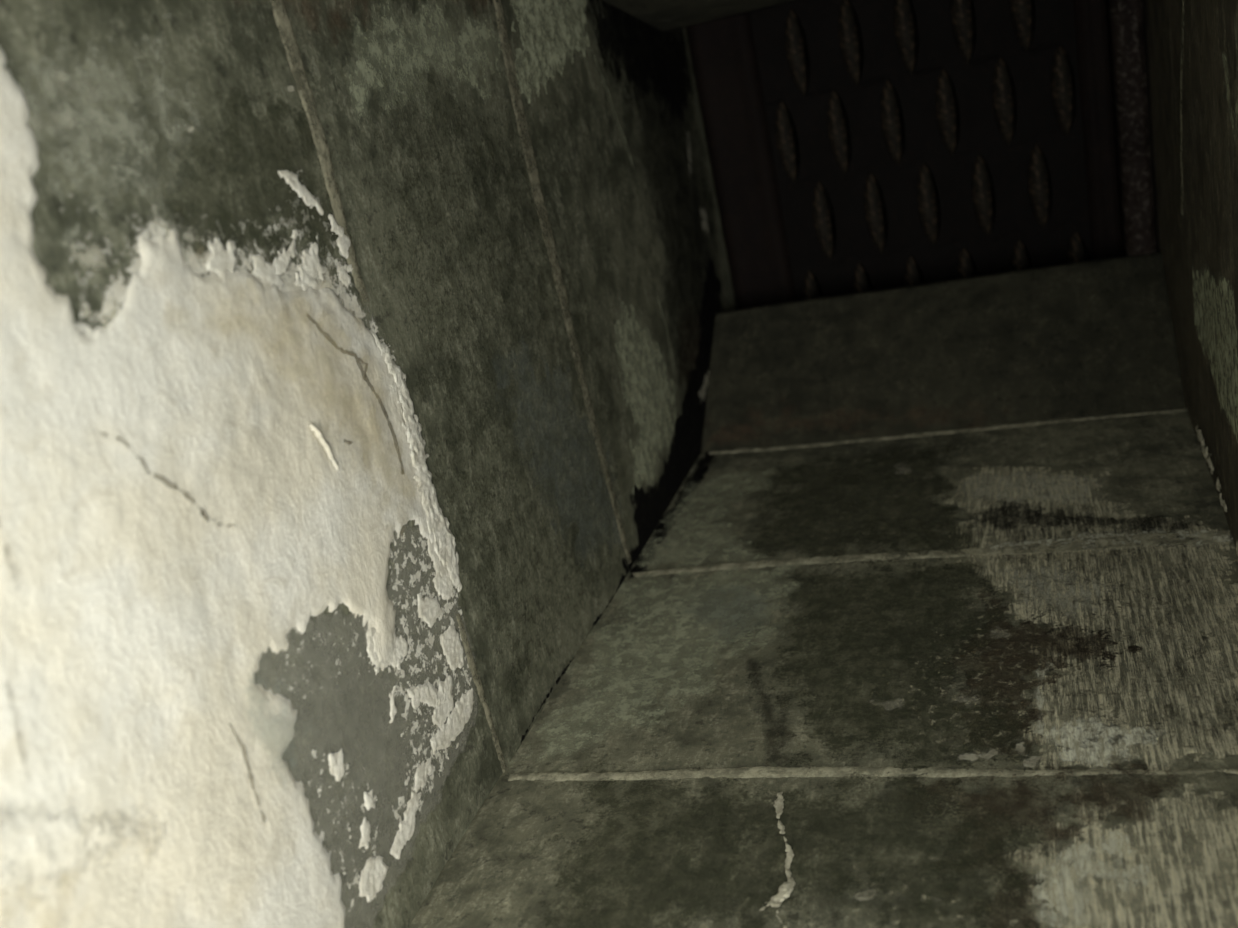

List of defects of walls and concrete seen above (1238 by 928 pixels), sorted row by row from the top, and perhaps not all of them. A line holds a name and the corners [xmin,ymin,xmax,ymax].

water stain [345,0,590,122]
peeling [182,169,361,309]
water stain [615,297,677,495]
water stain [1192,267,1238,443]
crack [105,436,237,527]
water stain [1195,425,1227,512]
peeling [255,524,477,928]
water stain [527,444,1238,928]
crack [759,792,795,928]